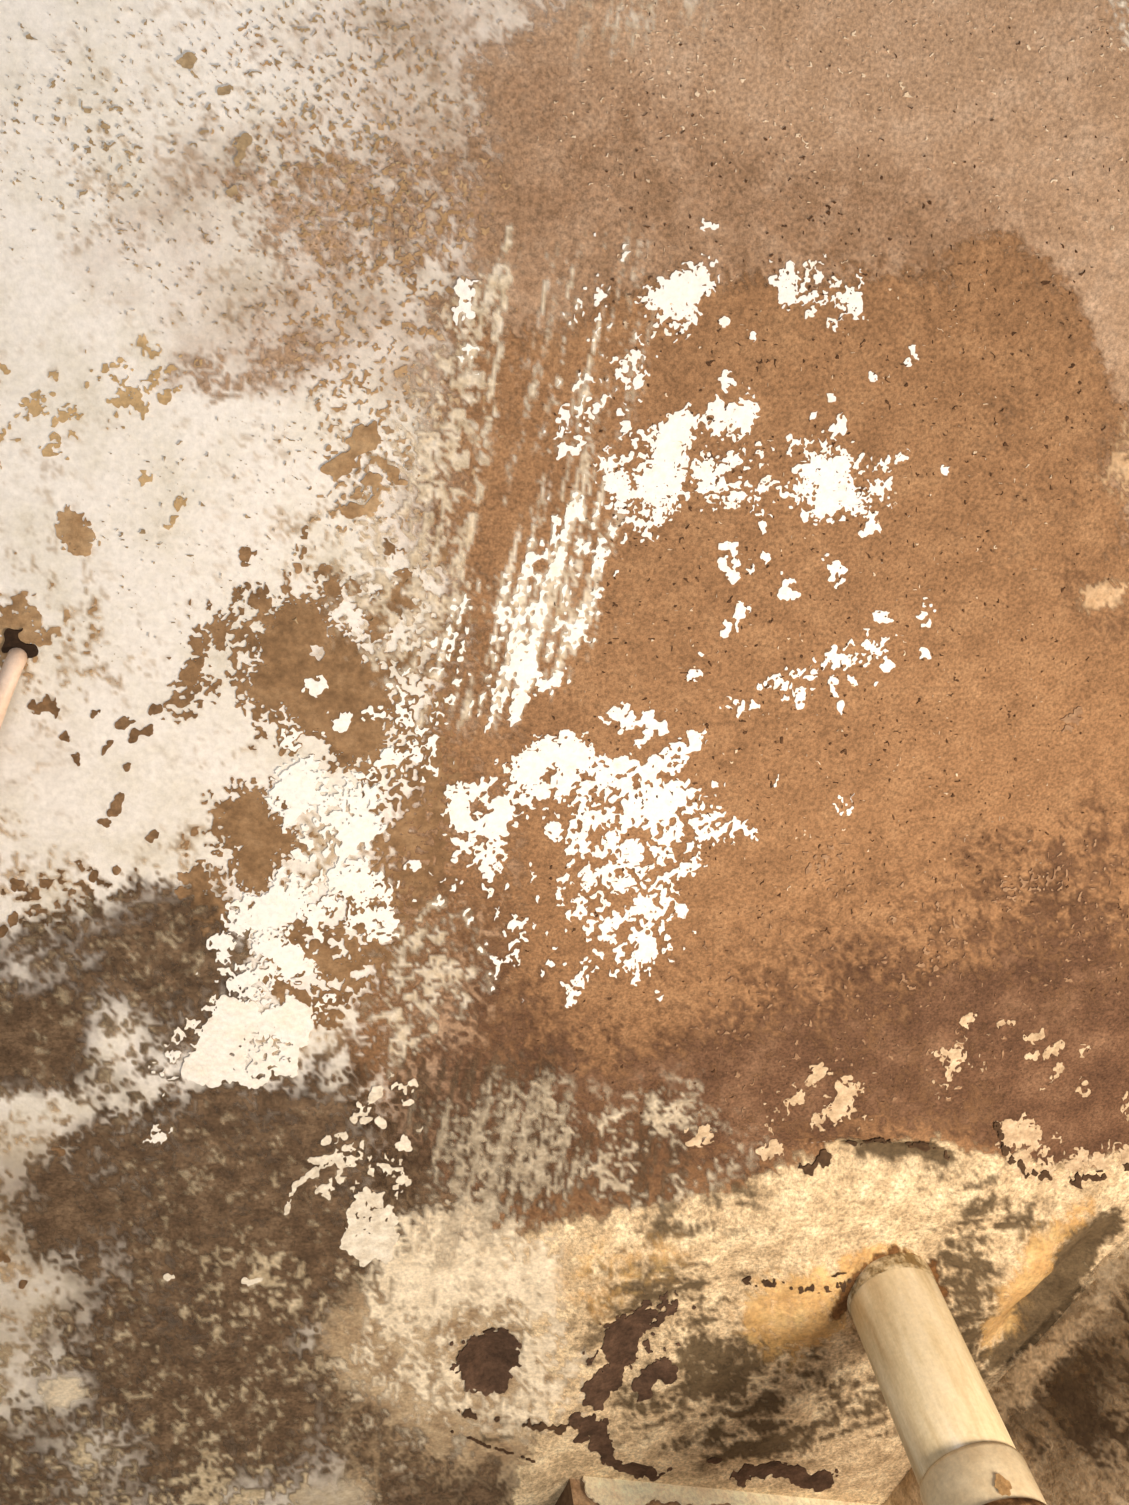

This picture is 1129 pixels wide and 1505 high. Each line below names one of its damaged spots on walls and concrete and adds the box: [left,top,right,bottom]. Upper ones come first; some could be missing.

damp [177,325,320,397]
peeling [0,370,84,460]
peeling [55,504,101,557]
peeling [0,583,105,677]
peeling [85,253,910,1097]
peeling [27,694,80,766]
peeling [0,860,137,938]
damp [0,877,250,1098]
damp [647,1205,708,1243]
damp [586,1250,888,1466]
damp [936,1176,1129,1505]
damp [0,1376,111,1505]